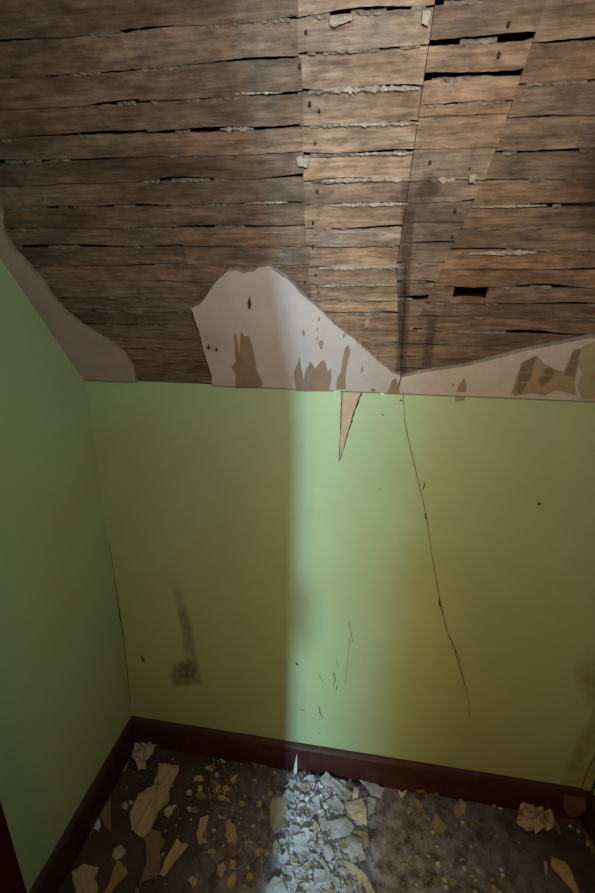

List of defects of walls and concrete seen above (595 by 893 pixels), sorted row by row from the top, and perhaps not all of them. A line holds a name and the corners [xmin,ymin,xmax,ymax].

peeling [232,333,263,387]
peeling [294,317,400,461]
peeling [511,348,582,396]
crack [399,260,470,715]
crack [582,755,595,792]